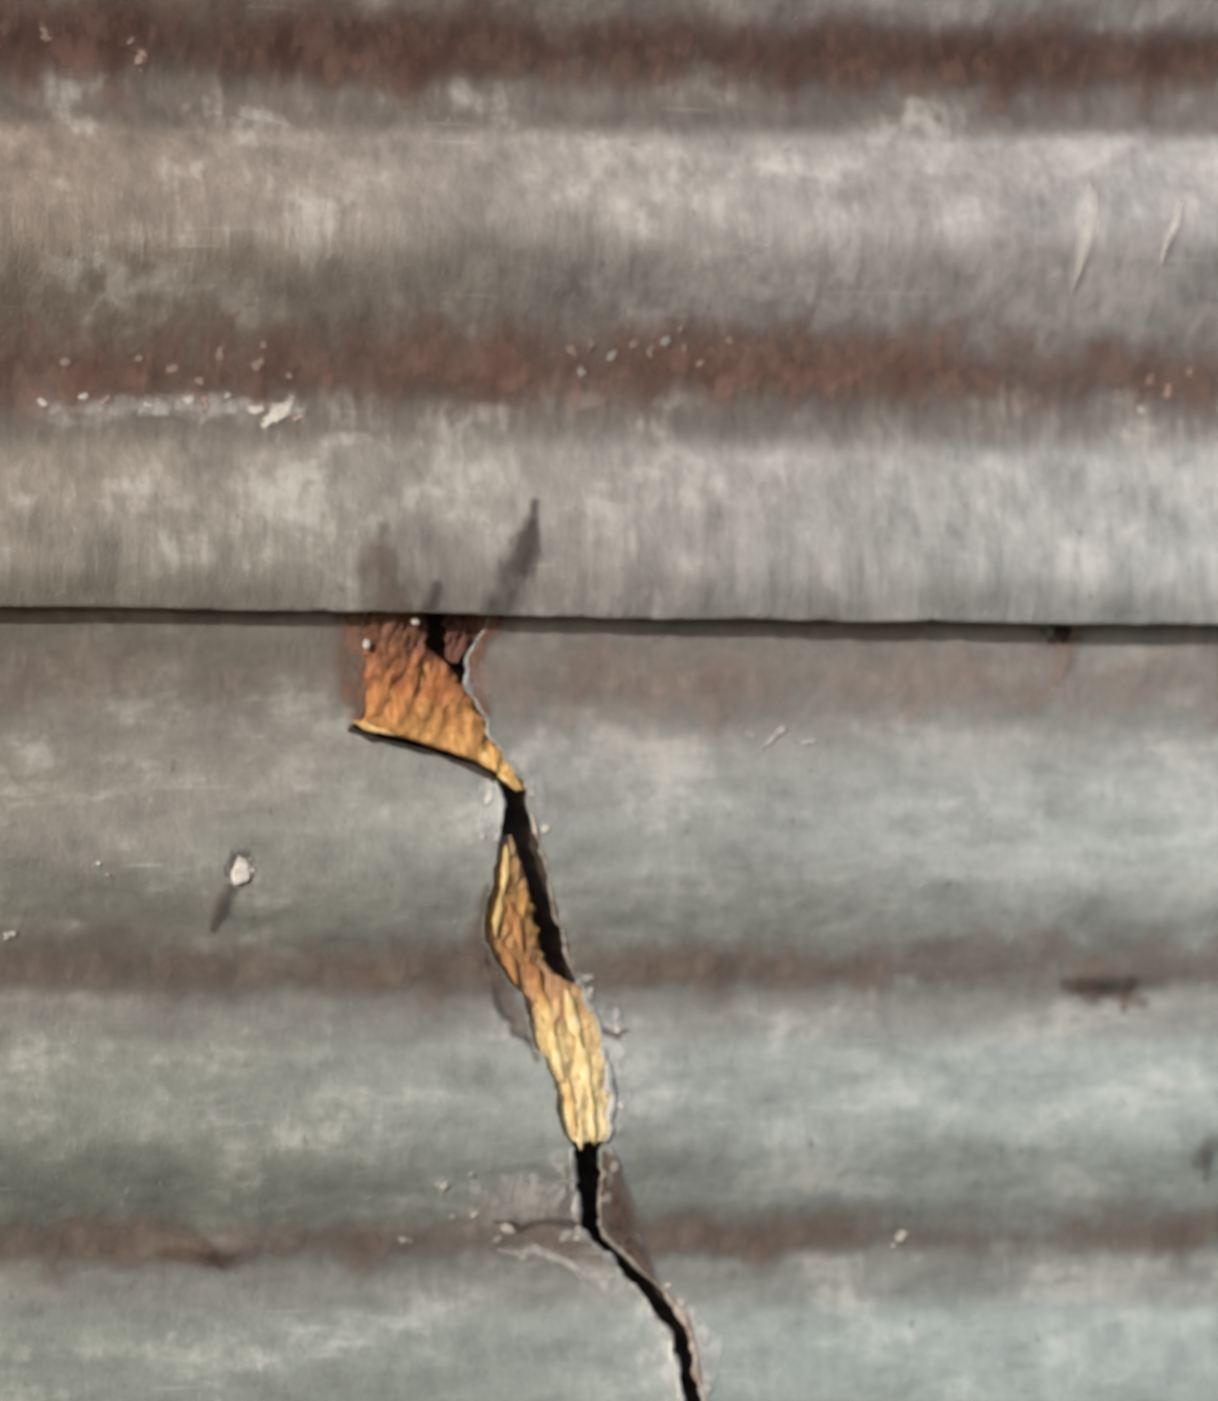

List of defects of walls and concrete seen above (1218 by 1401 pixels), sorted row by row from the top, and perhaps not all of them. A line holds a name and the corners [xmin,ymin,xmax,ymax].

rust [0,0,1218,105]
rust [0,320,1012,404]
leakage [491,499,538,613]
spalling [341,612,525,791]
spalling [448,820,609,1260]
crack [456,755,721,1401]